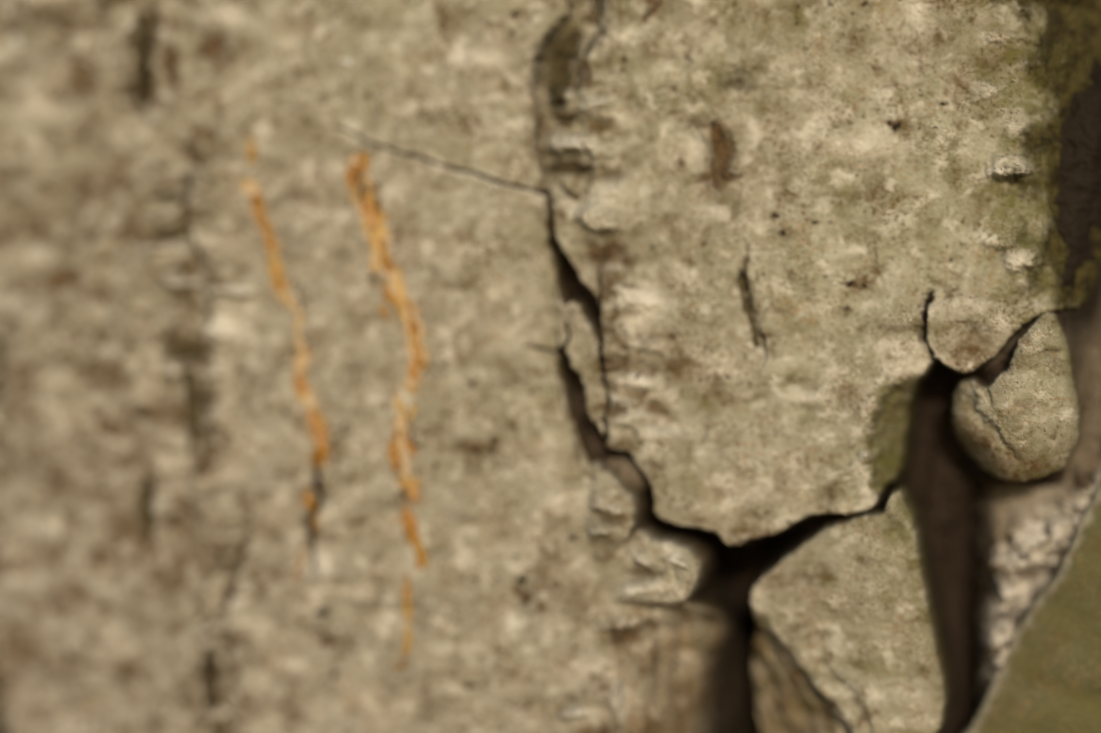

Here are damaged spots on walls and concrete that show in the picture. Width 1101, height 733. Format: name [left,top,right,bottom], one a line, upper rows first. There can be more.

crack [152,180,213,454]
crack [306,468,324,577]
crack [522,246,844,601]
crack [908,291,1067,733]